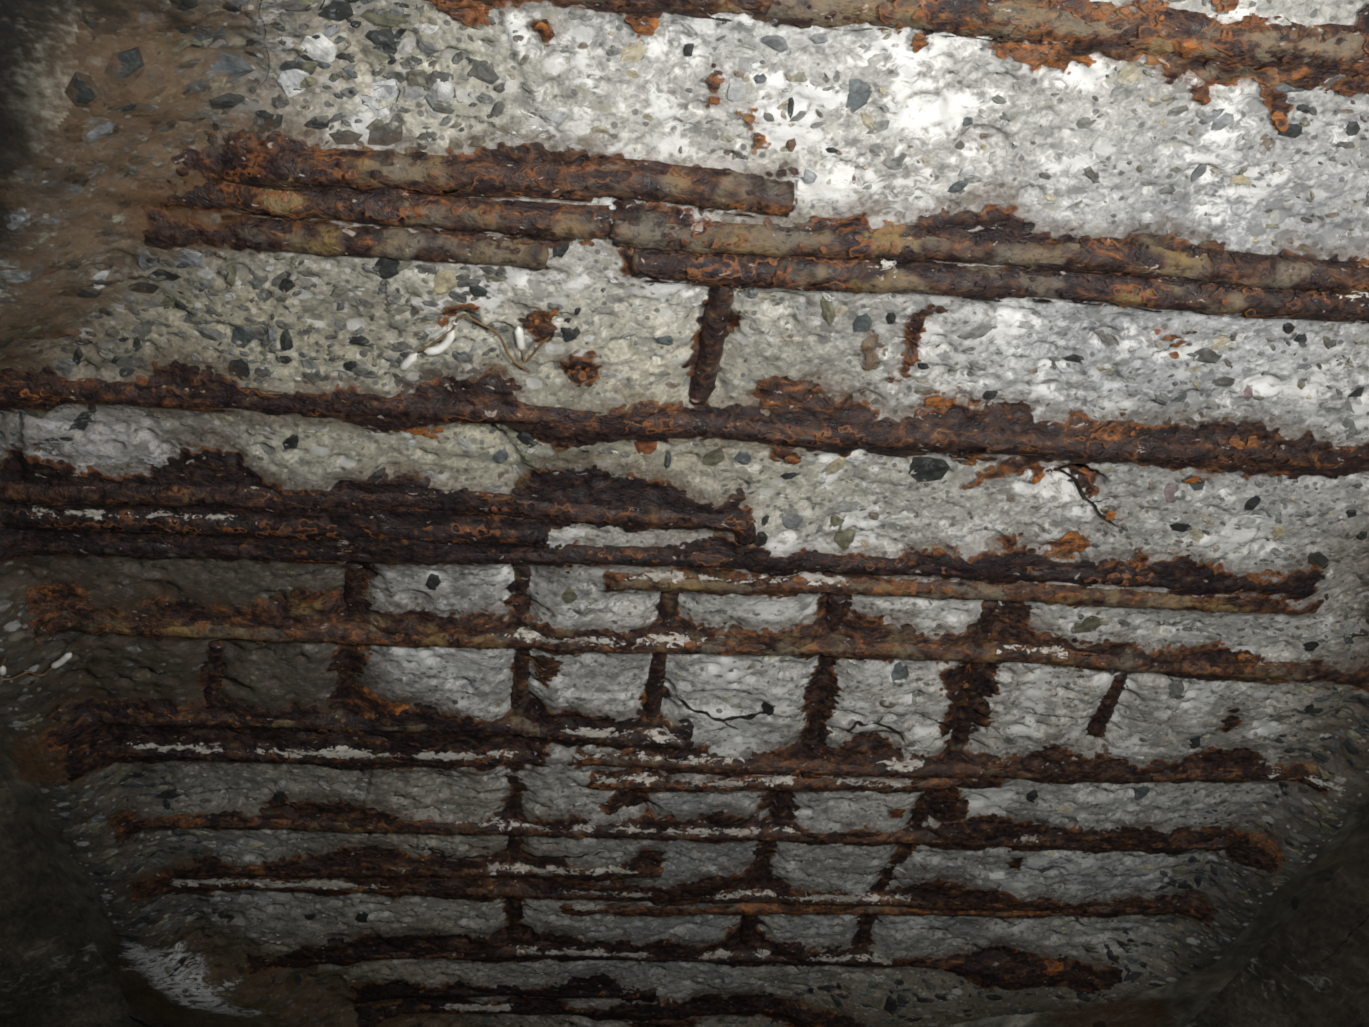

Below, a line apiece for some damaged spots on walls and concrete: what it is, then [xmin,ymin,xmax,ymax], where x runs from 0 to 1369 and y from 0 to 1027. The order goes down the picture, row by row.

corrosion [427,0,675,38]
corrosion [985,0,1369,132]
spalling [1129,0,1369,68]
leakage [0,0,230,364]
corrosion [935,410,1153,499]
corrosion [17,683,551,783]
crack [676,694,776,729]
corrosion [937,661,1001,737]
spalling [521,836,761,889]
spalling [769,841,899,896]
spalling [130,867,1219,953]
spalling [244,924,1123,994]